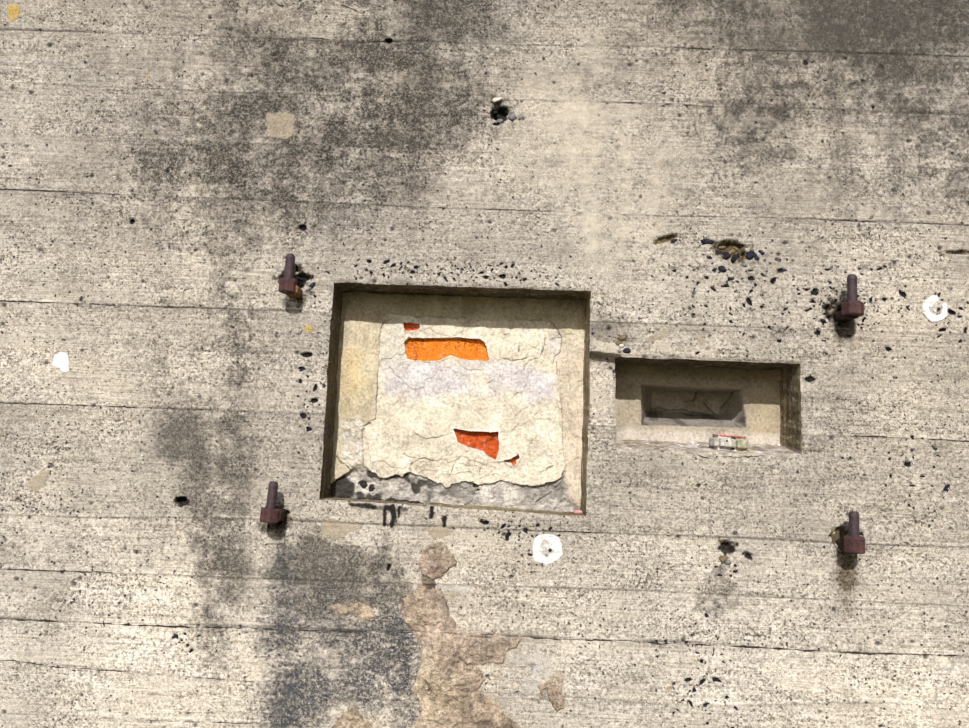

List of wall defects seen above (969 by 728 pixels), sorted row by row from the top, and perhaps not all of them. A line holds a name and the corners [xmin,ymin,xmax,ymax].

damp [134,0,507,279]
spalling [653,233,678,245]
flaking render [403,322,489,362]
spalling [671,239,917,364]
hole [937,292,969,343]
flaking render [454,429,520,466]
damp [158,414,250,598]
damp [348,480,407,528]
damp [255,535,422,728]
flaking render [329,601,375,620]
flaking render [399,542,522,728]
flaking render [538,670,565,712]